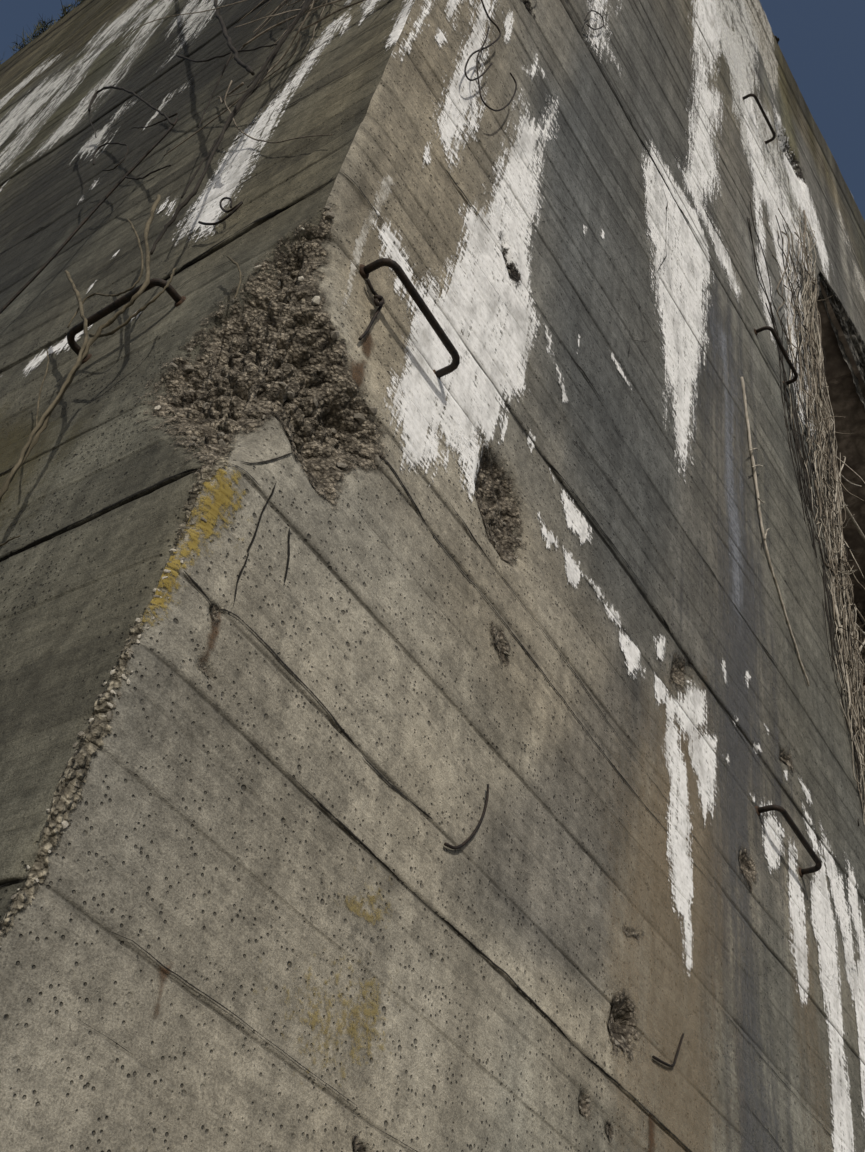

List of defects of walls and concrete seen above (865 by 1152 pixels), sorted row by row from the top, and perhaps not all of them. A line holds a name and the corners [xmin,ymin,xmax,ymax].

spalling [474,444,527,565]
spalling [0,206,388,948]
spalling [608,989,641,1060]